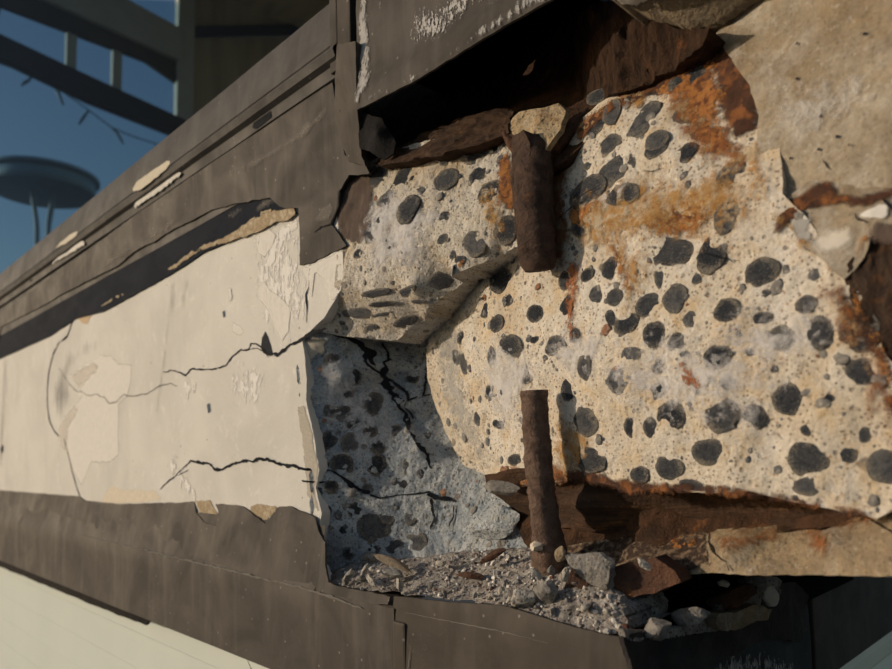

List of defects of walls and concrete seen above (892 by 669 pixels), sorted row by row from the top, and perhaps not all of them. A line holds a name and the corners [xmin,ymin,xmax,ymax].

rust [553,0,767,338]
rust [773,181,892,233]
peeling [59,355,131,484]
crack [47,268,432,496]
spalling [168,64,892,577]
rust [827,288,892,416]
peeling [102,486,160,504]
crack [160,457,455,530]